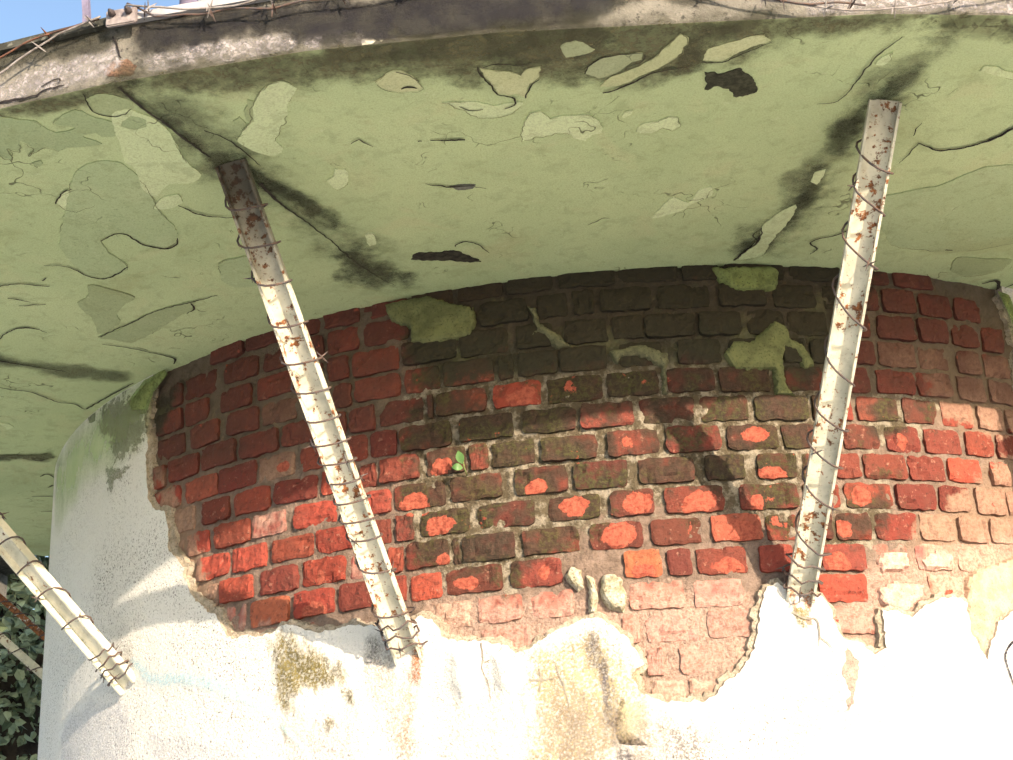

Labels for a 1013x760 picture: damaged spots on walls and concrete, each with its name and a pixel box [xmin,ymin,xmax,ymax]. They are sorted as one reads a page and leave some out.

crack [0,78,394,285]
damp [251,169,337,230]
damp [0,0,1013,174]
peeling [560,33,689,87]
spalling [703,35,771,97]
crack [899,123,1013,163]
flaking render [88,330,381,639]
flaking render [306,204,840,703]
flaking render [816,164,1013,712]
damp [273,633,352,710]
damp [528,628,651,760]
damp [665,721,706,760]